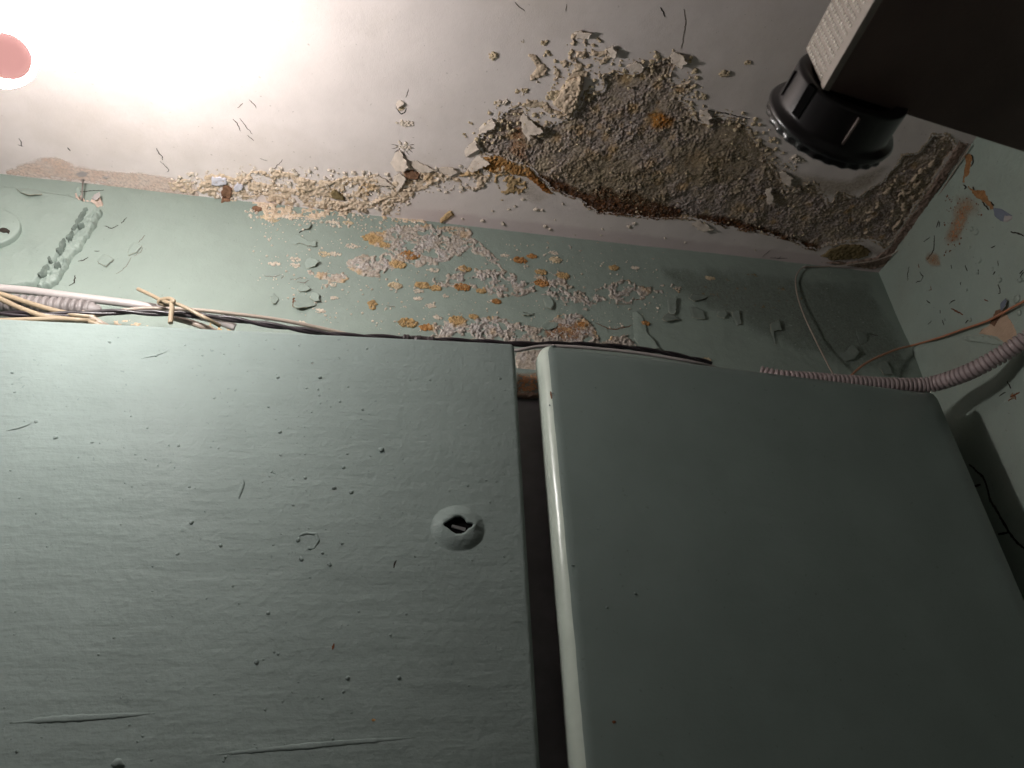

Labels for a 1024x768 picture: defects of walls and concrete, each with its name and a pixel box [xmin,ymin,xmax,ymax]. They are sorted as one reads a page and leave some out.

flaking render [7,30,1012,269]
rust [478,128,682,220]
peeling [964,298,1017,345]